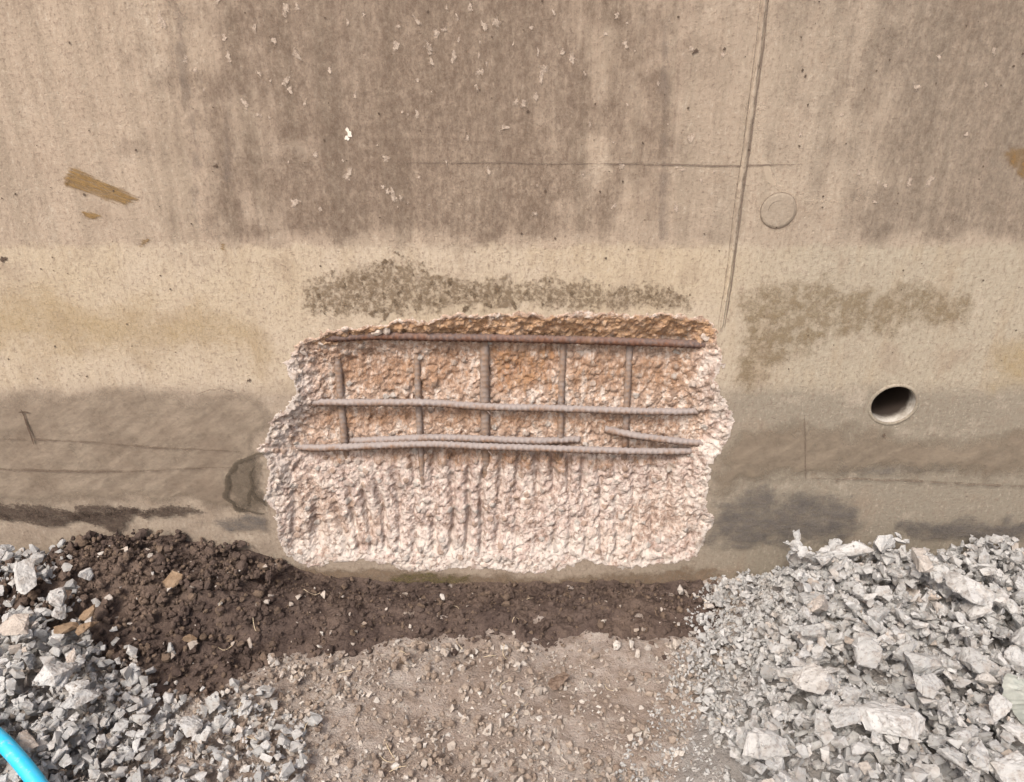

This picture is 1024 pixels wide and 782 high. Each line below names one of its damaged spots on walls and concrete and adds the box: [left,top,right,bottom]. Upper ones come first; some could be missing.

damp [304,252,691,320]
rust [316,315,715,393]
damp [737,286,968,381]
spalling [257,310,735,574]
damp [0,503,199,532]
damp [704,486,857,548]
damp [897,519,1024,541]